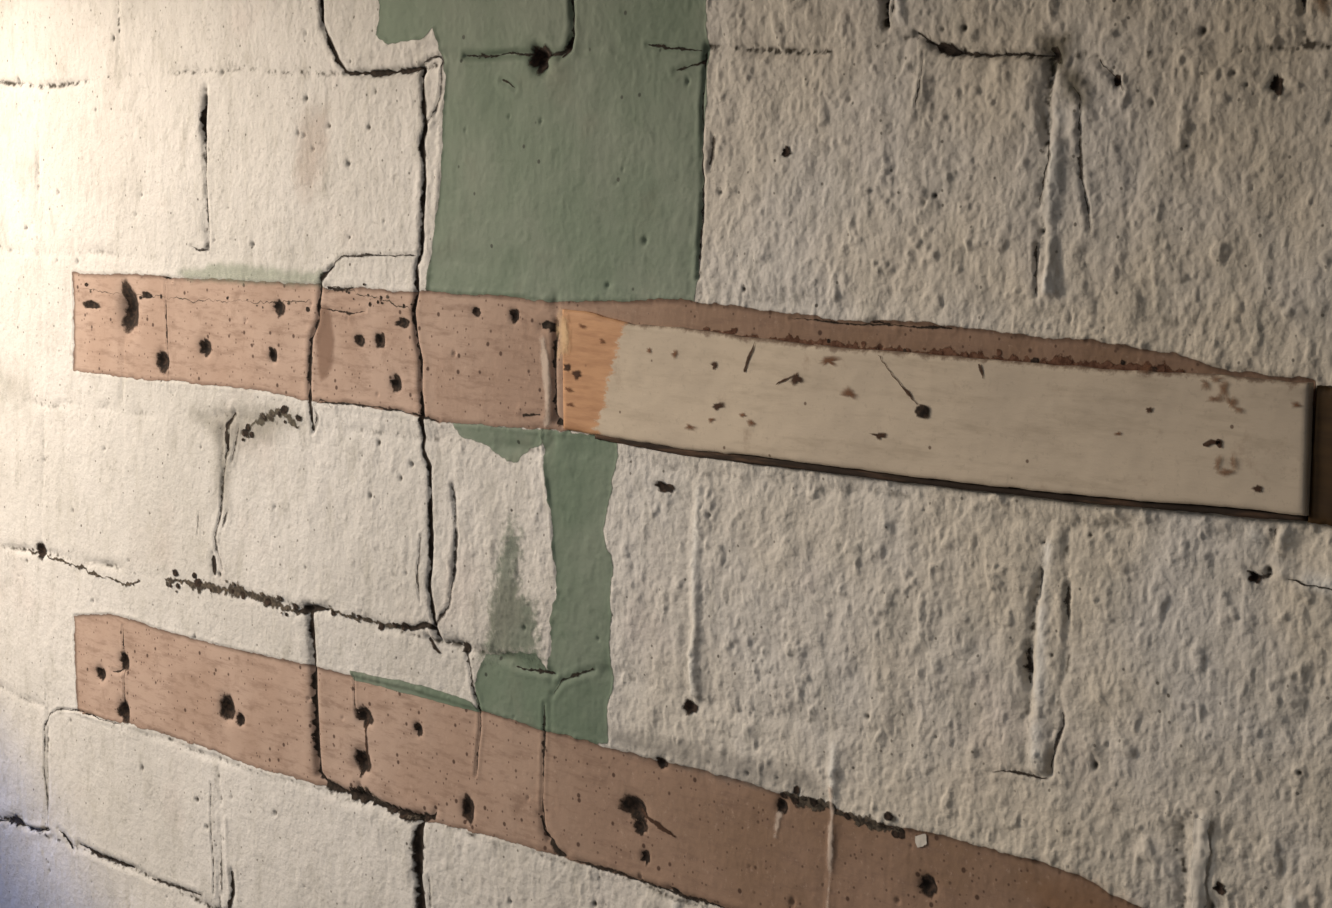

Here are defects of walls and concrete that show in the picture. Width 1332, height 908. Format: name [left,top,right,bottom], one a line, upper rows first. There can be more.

crack [194,102,210,252]
peeling [72,0,1316,450]
crack [886,0,1090,228]
crack [0,632,234,908]
crack [197,412,239,575]
crack [298,604,437,908]
crack [307,0,575,774]
peeling [74,423,1141,908]
crack [1023,647,1033,683]
crack [995,712,1064,779]
crack [1040,573,1070,620]
peeling [1191,818,1225,908]